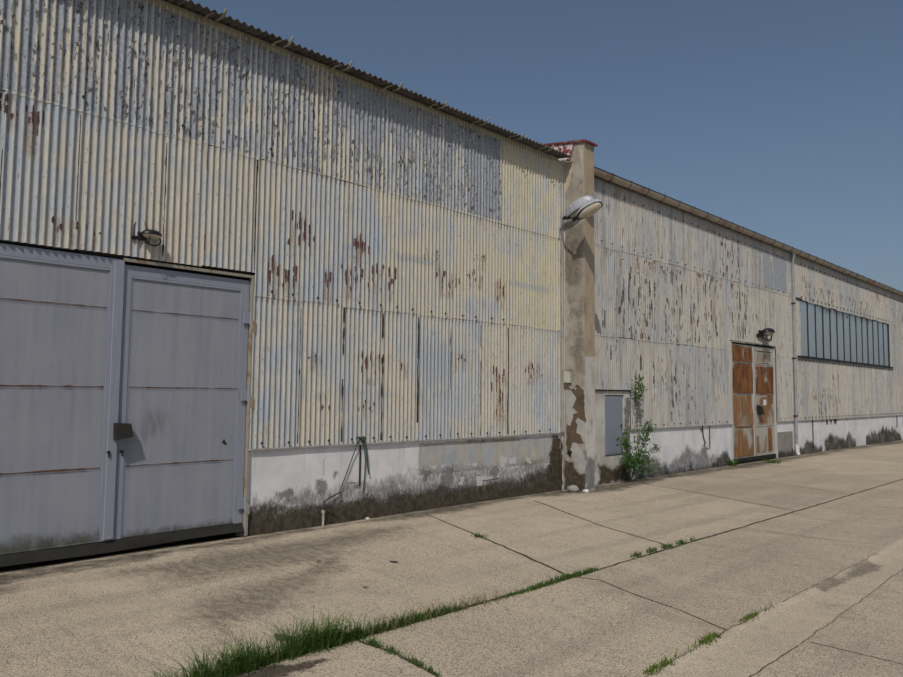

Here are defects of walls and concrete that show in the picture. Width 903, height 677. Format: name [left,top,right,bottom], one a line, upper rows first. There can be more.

rust [0,93,44,159]
peeling [0,0,502,221]
rust [51,216,101,252]
rust [267,210,315,305]
rust [323,233,397,305]
rust [358,350,384,385]
rust [491,365,509,429]
peeling [419,385,586,486]
damp [247,427,903,539]
rust [732,345,774,457]
crack [644,553,877,677]
crack [749,568,903,677]